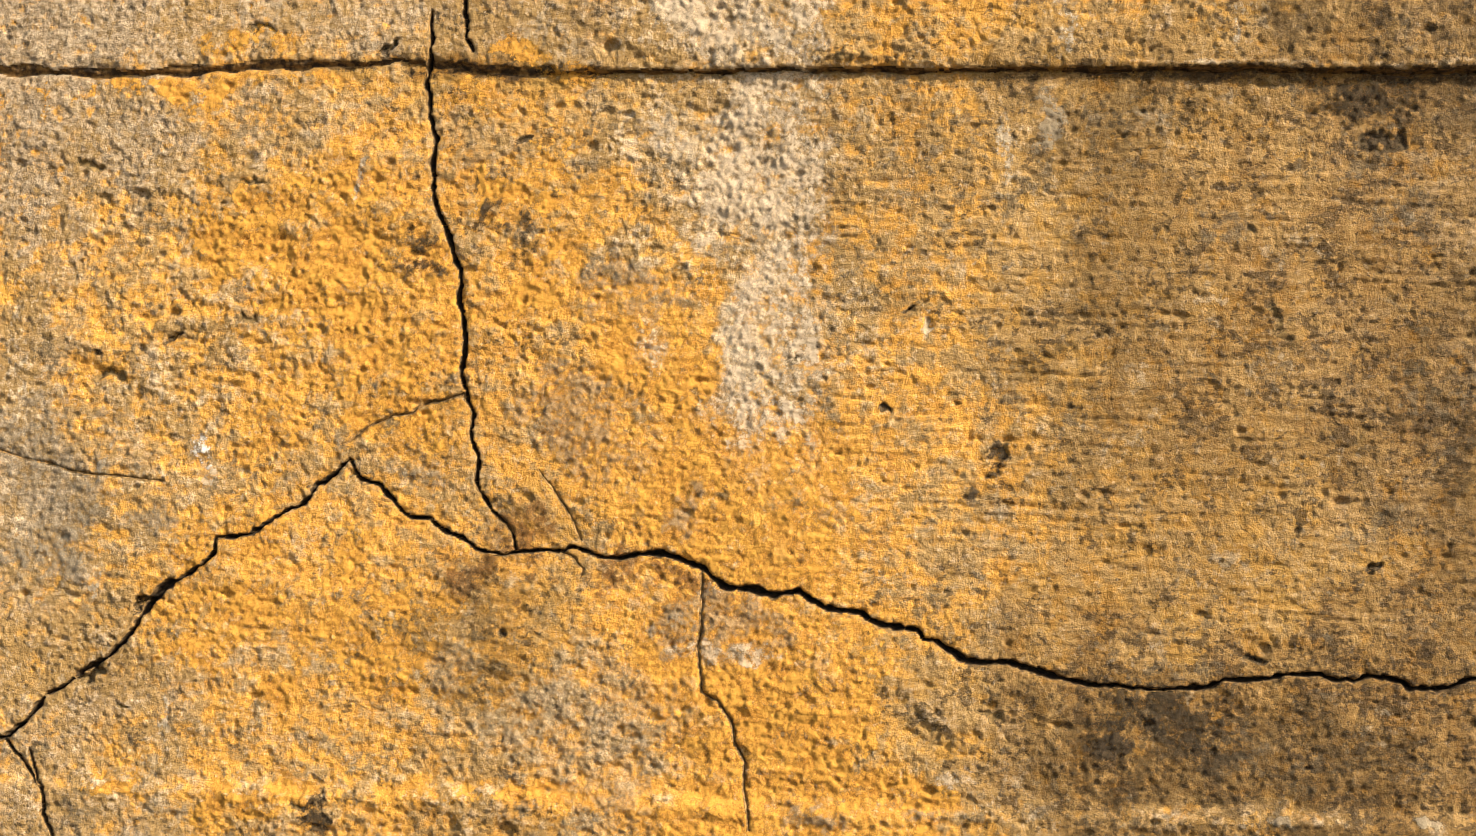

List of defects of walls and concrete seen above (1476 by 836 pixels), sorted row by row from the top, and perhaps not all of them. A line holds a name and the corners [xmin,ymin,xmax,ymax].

crack [461,0,475,53]
leakage [1317,78,1415,128]
crack [423,11,518,550]
crack [341,392,464,445]
crack [0,449,164,482]
leakage [967,440,1011,502]
crack [0,458,1476,836]
leakage [1083,681,1245,777]